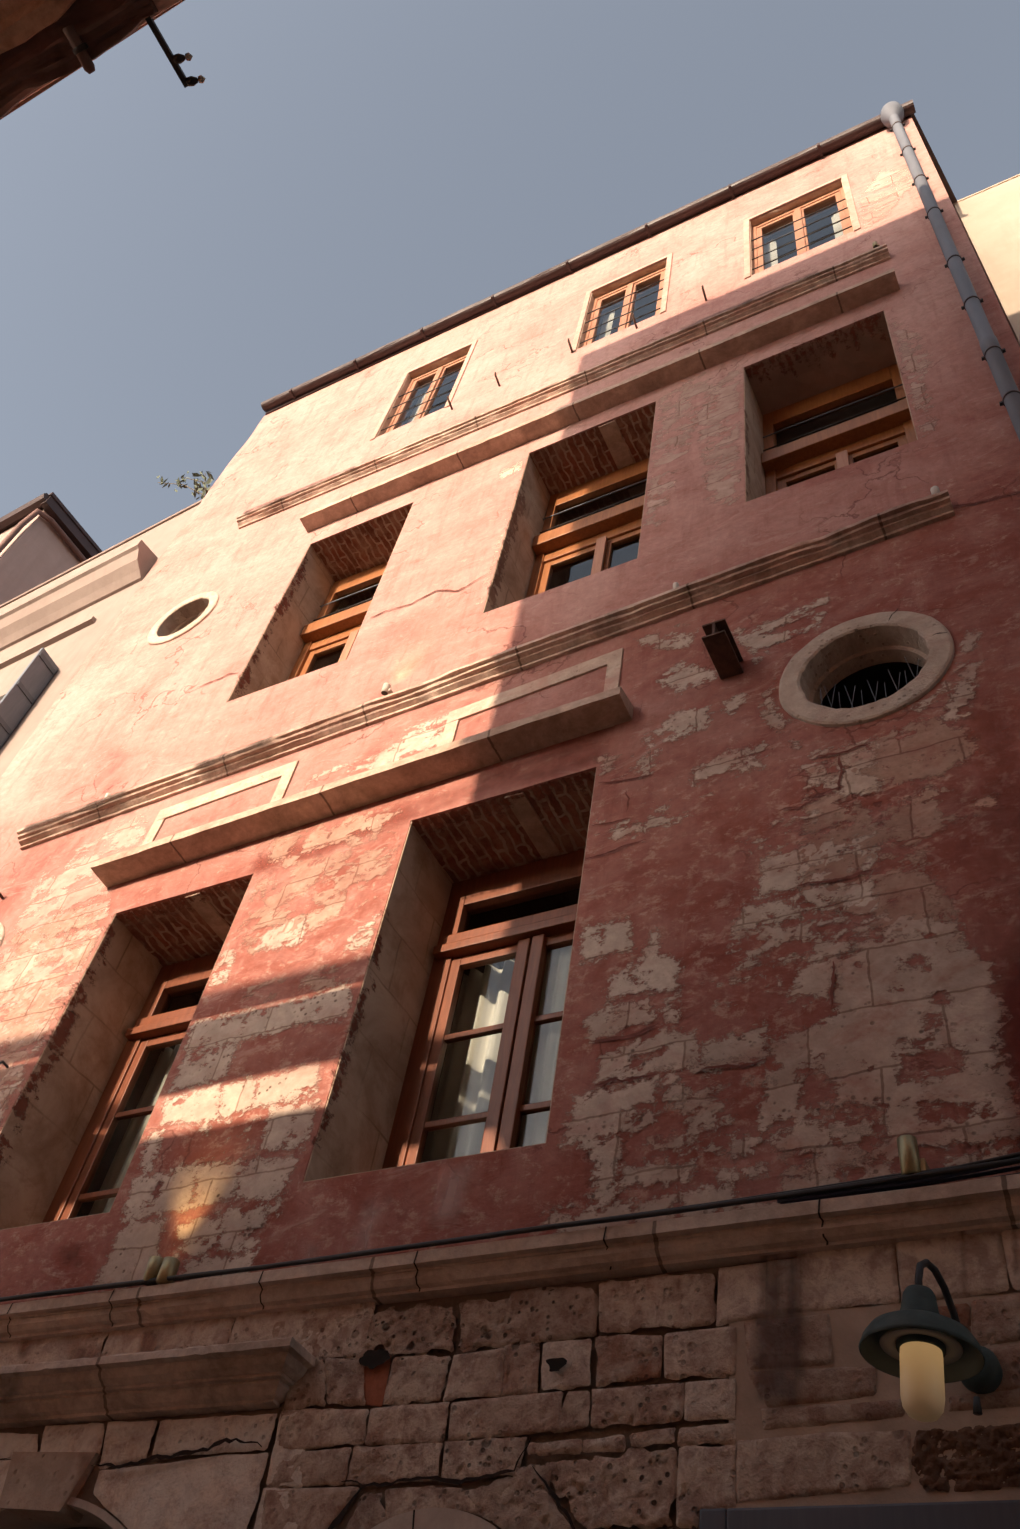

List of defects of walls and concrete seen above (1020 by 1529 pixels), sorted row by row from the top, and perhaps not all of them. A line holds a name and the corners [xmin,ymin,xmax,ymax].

peeling [233,555,308,700]
peeling [731,596,830,665]
spalling [0,623,1020,1293]
crack [328,1437,575,1529]